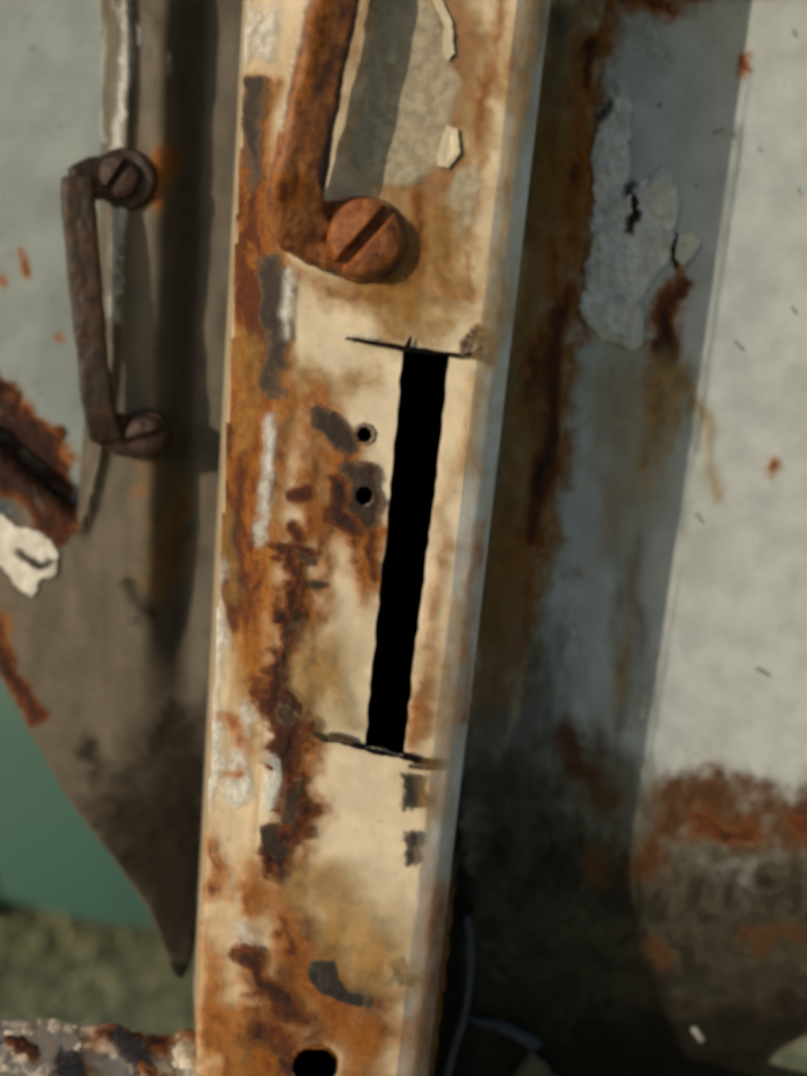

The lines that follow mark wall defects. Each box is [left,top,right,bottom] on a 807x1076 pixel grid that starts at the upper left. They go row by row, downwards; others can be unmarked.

corrosion [313,0,503,338]
peeling [355,0,480,228]
peeling [579,76,701,353]
corrosion [739,53,750,75]
corrosion [471,0,705,719]
peeling [0,495,60,597]
corrosion [0,378,80,546]
corrosion [54,79,398,1076]
corrosion [0,613,49,727]
corrosion [556,723,620,812]
corrosion [630,764,807,879]
corrosion [3,1035,40,1061]